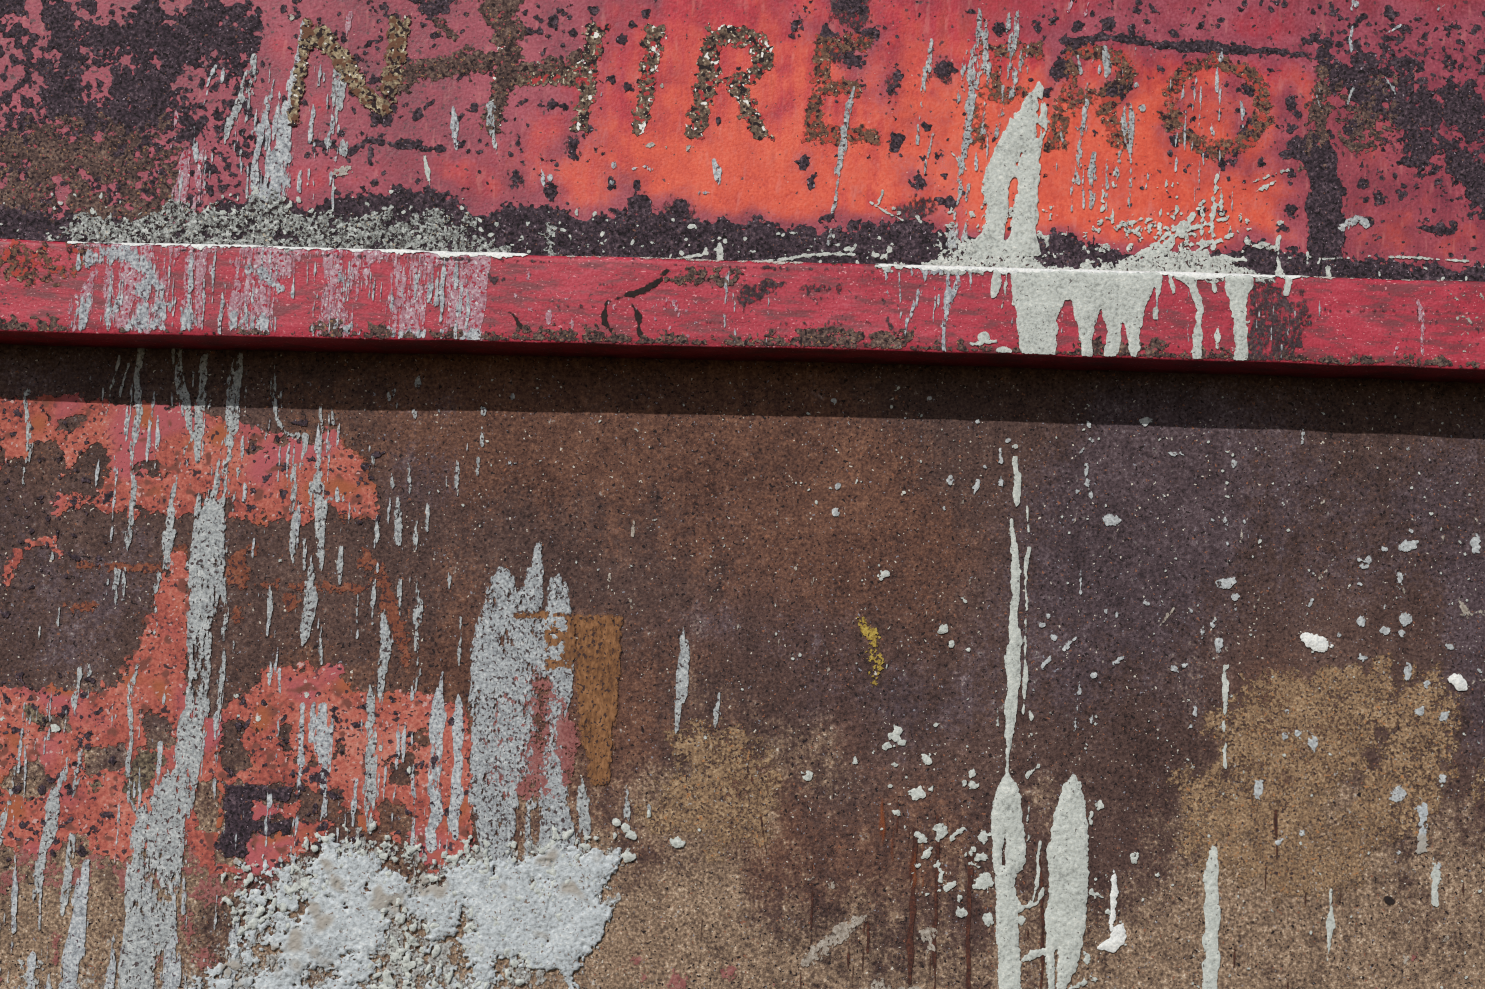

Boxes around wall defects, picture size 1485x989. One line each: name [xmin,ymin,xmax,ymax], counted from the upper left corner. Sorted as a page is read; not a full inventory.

peeling [333,165,353,177]
peeling [0,390,413,667]
peeling [0,535,582,878]
corrosion [634,717,783,863]
corrosion [1165,652,1485,914]
corrosion [847,921,870,980]
corrosion [880,801,948,989]
corrosion [965,854,978,989]
corrosion [1027,855,1045,989]